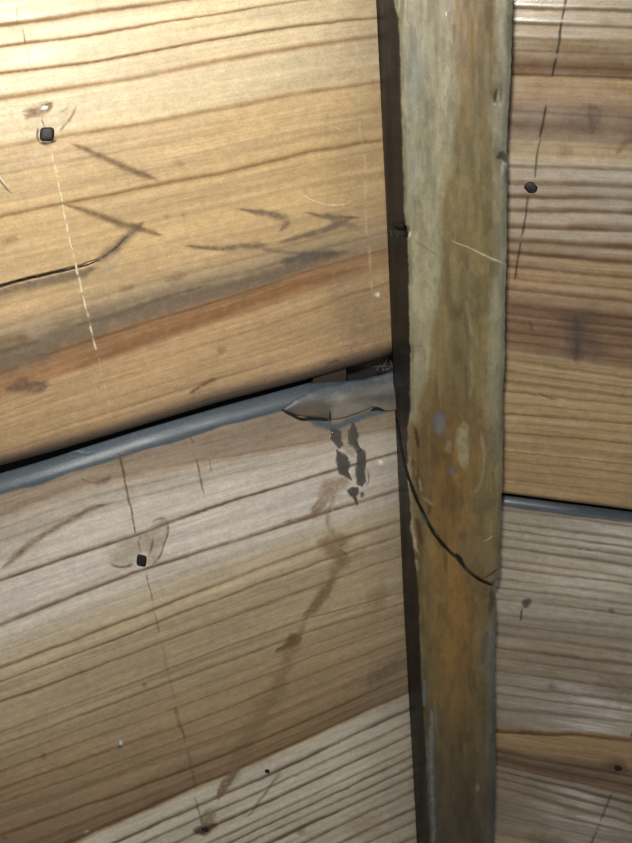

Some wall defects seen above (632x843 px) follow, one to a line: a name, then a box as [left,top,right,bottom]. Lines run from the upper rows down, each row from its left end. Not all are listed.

crack [0,223,142,293]
crack [281,409,331,421]
crack [371,407,496,585]